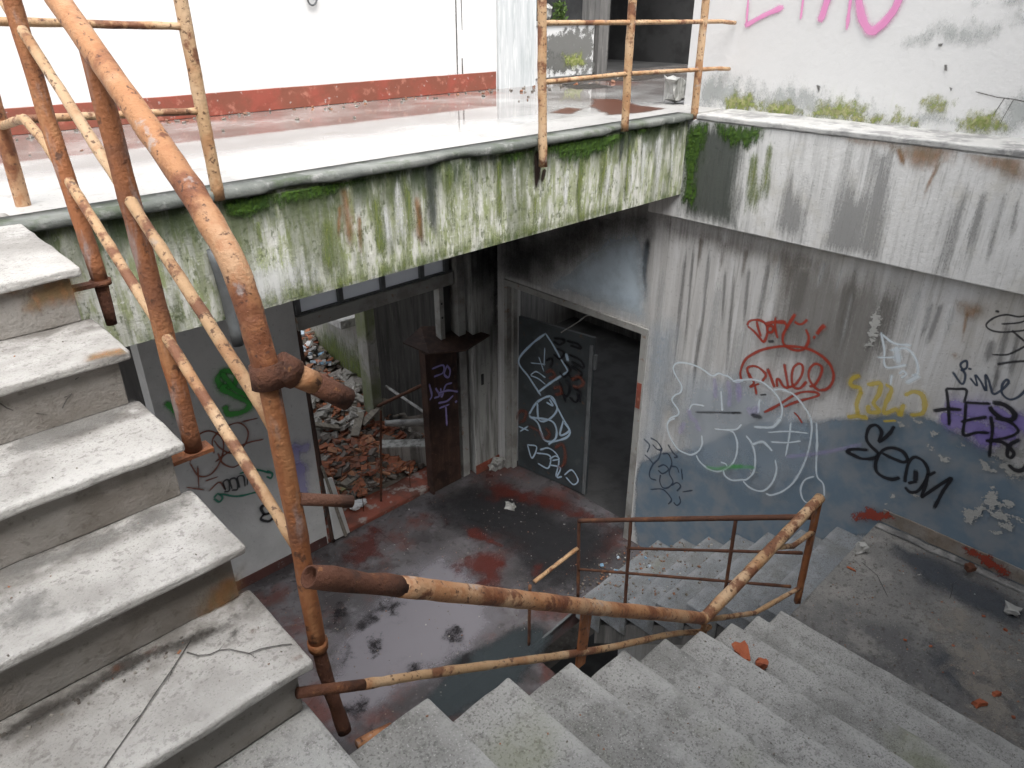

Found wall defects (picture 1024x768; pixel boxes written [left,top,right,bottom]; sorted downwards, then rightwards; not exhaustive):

damp [419,165,436,238]
damp [620,132,674,184]
damp [683,125,743,224]
damp [780,181,806,233]
damp [827,150,891,256]
damp [969,195,986,243]
damp [254,267,306,299]
flaking render [962,486,1024,535]
crack [104,640,292,768]
damp [428,626,552,720]